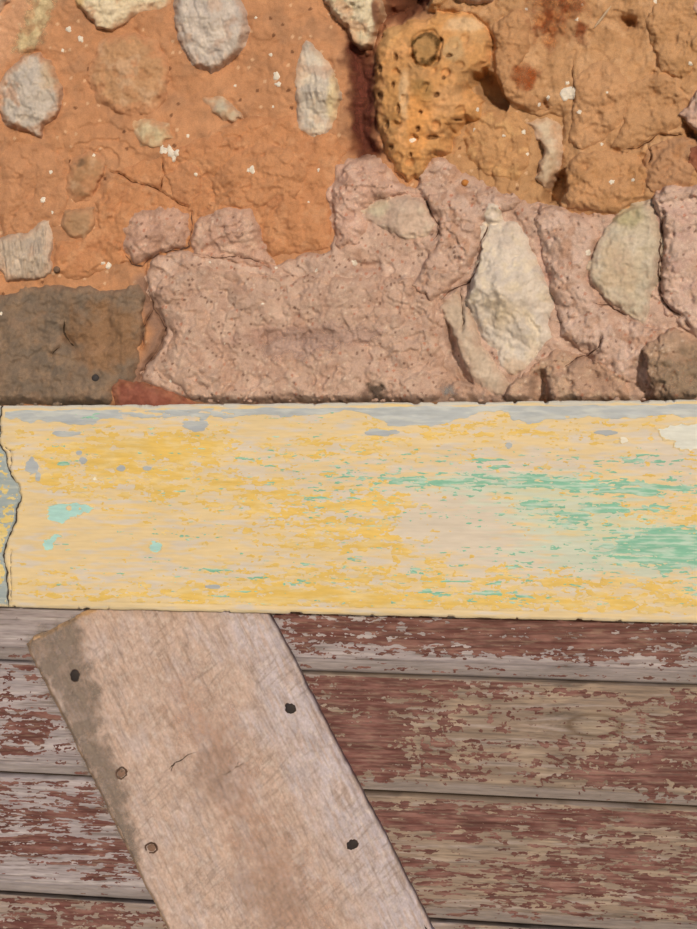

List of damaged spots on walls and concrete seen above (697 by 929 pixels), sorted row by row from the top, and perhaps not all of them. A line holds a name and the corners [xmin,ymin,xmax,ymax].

water stain [347,37,377,157]
water stain [411,32,441,65]
crack [442,226,488,325]
peeling [0,404,697,929]